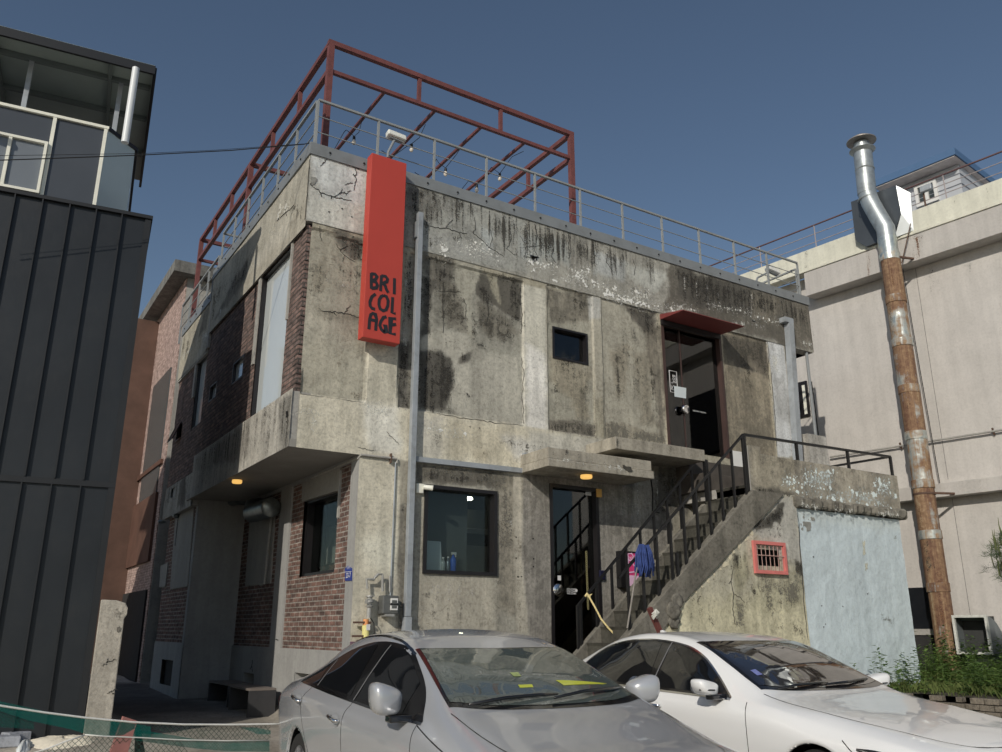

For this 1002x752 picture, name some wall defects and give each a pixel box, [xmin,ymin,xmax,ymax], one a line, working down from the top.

crack [277,159,359,262]
leakage [367,185,628,416]
leakage [675,271,808,328]